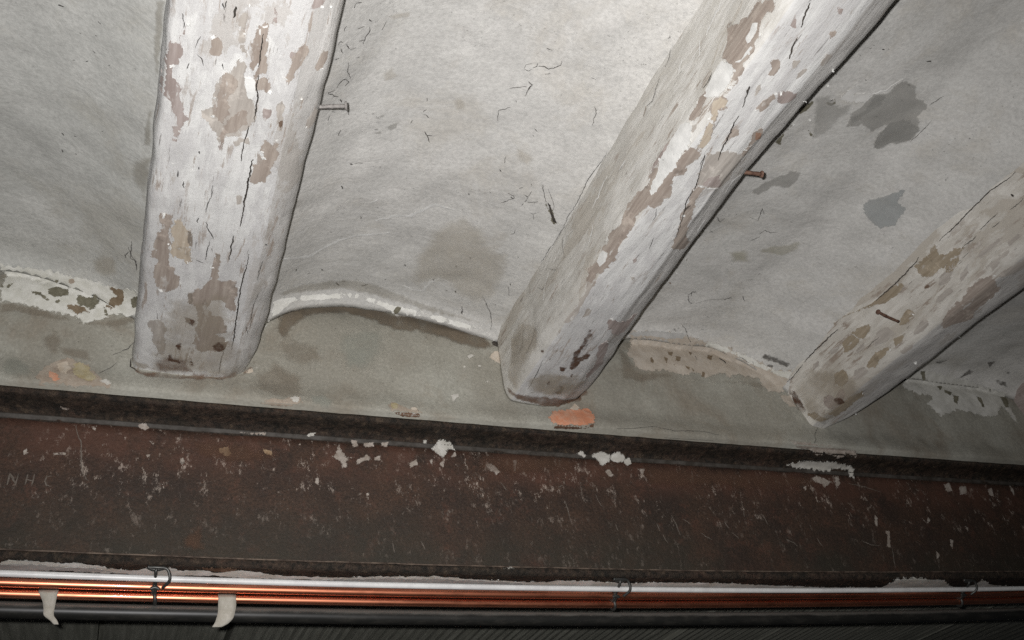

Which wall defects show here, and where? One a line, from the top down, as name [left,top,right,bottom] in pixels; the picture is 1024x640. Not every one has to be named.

peeling [159,24,190,142]
crack [177,34,267,374]
peeling [201,4,285,184]
peeling [284,43,328,85]
peeling [564,0,776,323]
flaking render [755,59,903,145]
damp [863,190,906,228]
damp [847,81,926,148]
peeling [0,263,138,324]
peeling [150,213,239,353]
peeling [586,313,797,407]
peeling [808,234,1024,422]